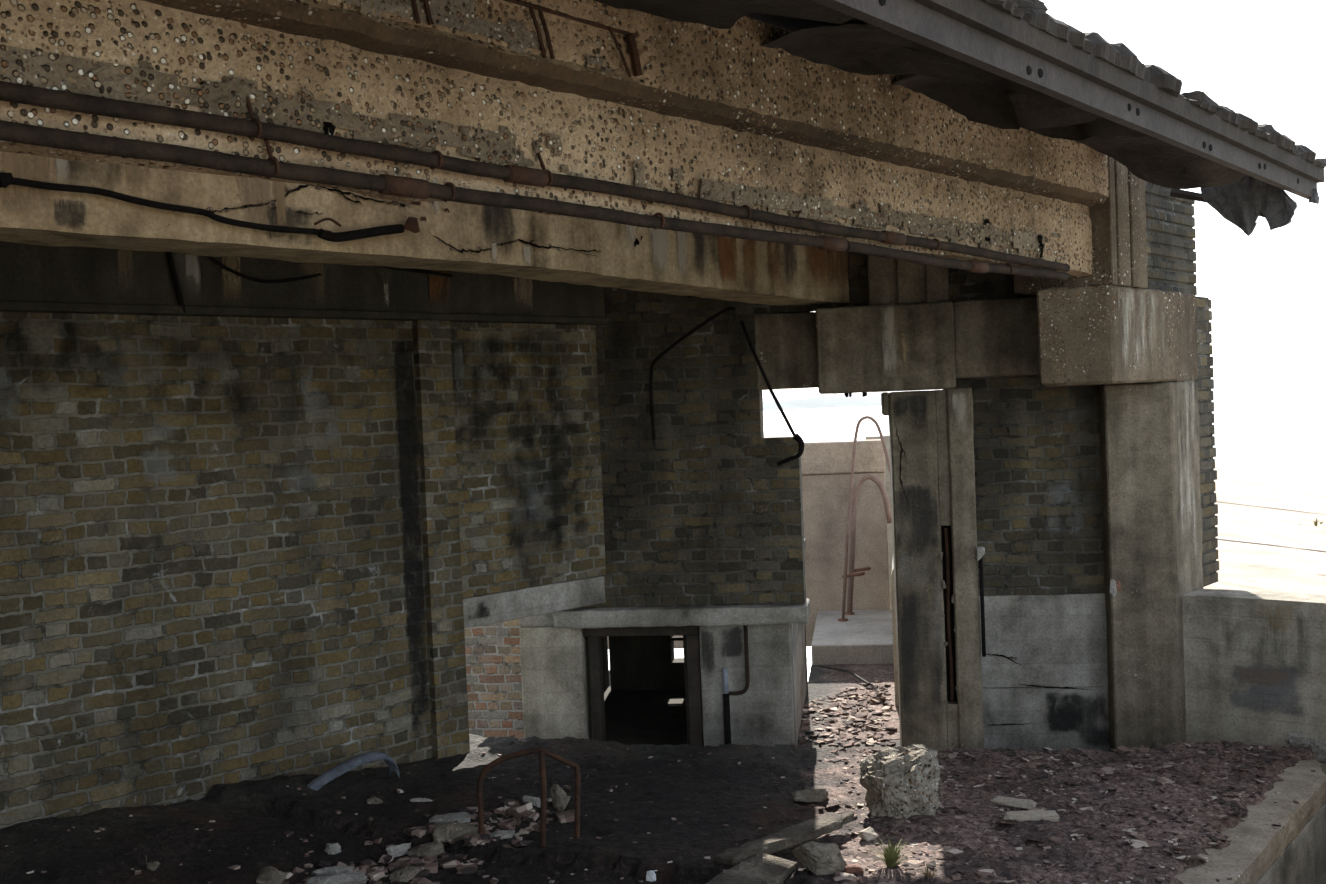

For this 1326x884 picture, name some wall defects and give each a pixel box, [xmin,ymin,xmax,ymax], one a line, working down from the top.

leakage [2,152,86,226]
leakage [241,177,309,240]
crack [206,185,410,215]
leakage [484,206,532,302]
crack [432,235,600,258]
leakage [395,341,428,729]